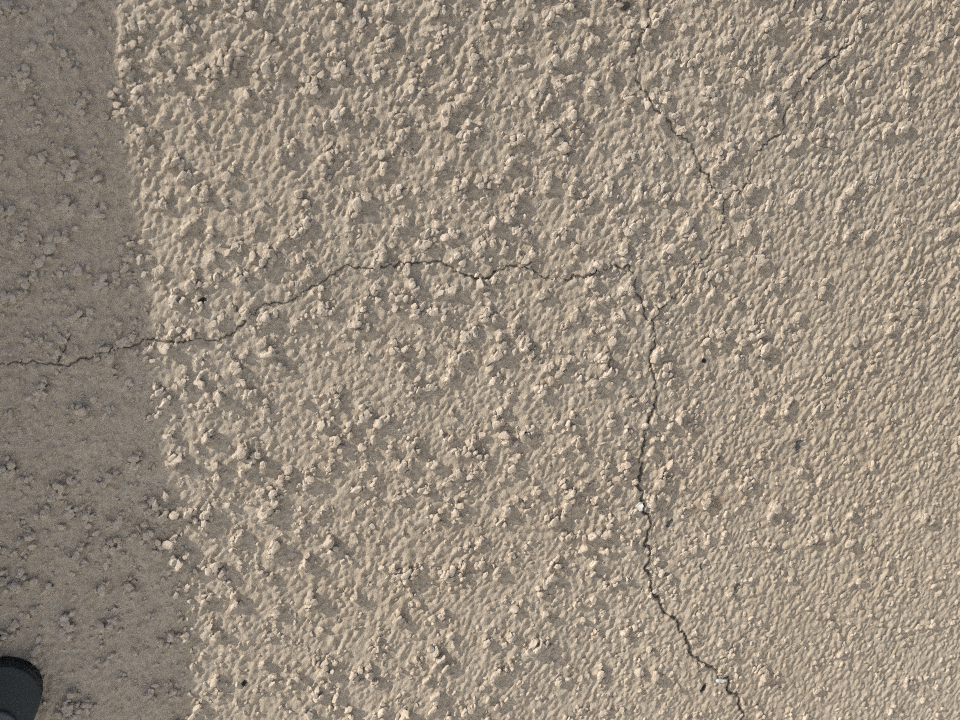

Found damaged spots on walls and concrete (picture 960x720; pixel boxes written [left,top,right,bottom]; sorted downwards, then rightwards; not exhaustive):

crack [1,335,101,367]
crack [114,5,867,720]